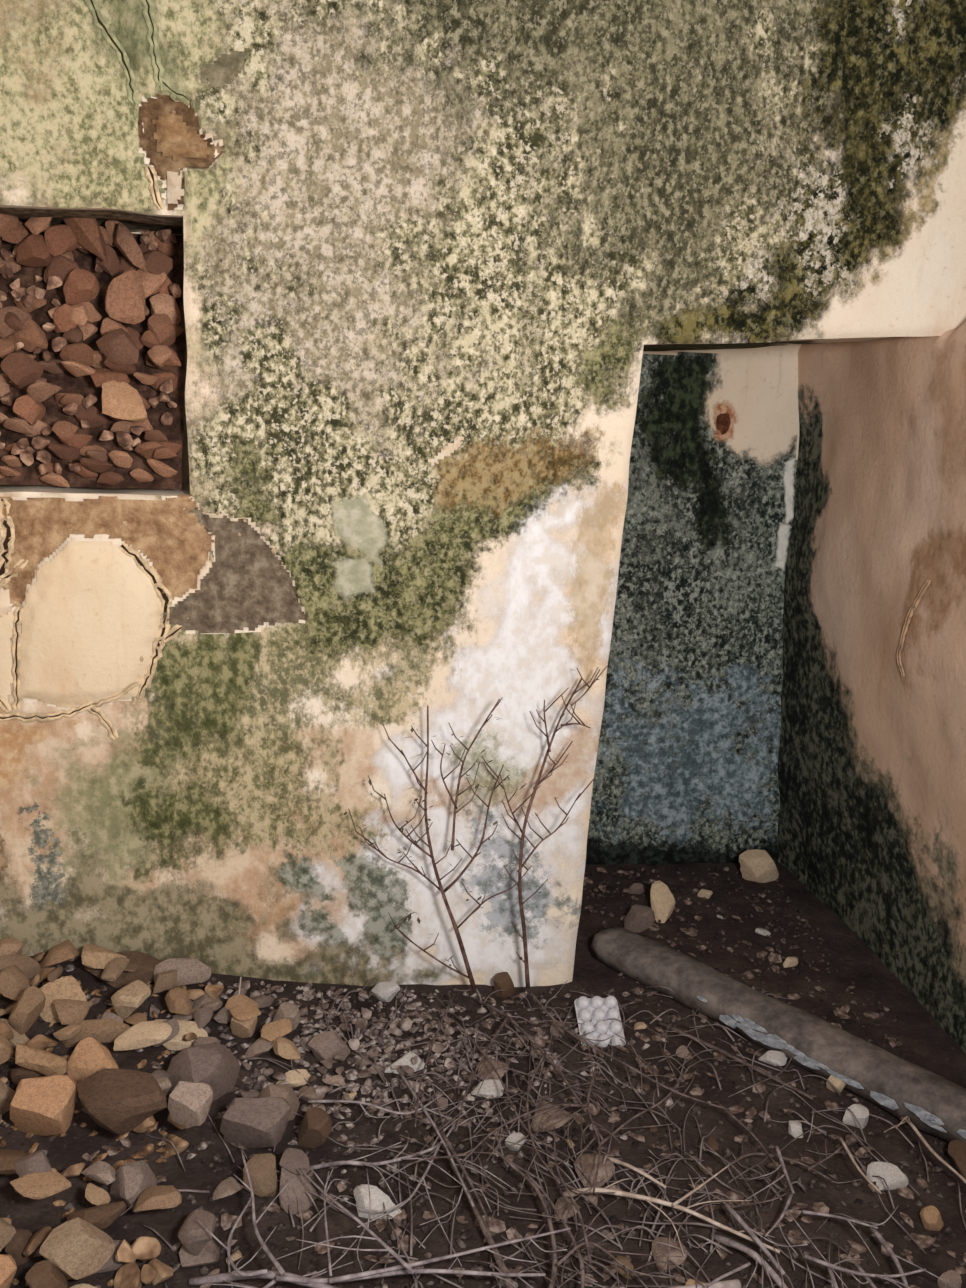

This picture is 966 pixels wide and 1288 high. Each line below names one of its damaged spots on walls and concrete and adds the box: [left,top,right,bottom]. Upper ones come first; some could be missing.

spalling [138,93,226,210]
damp [0,208,183,234]
crack [0,498,188,740]
spalling [0,495,307,633]
damp [731,801,756,817]
damp [760,838,780,863]
damp [835,677,918,861]
damp [912,833,966,997]